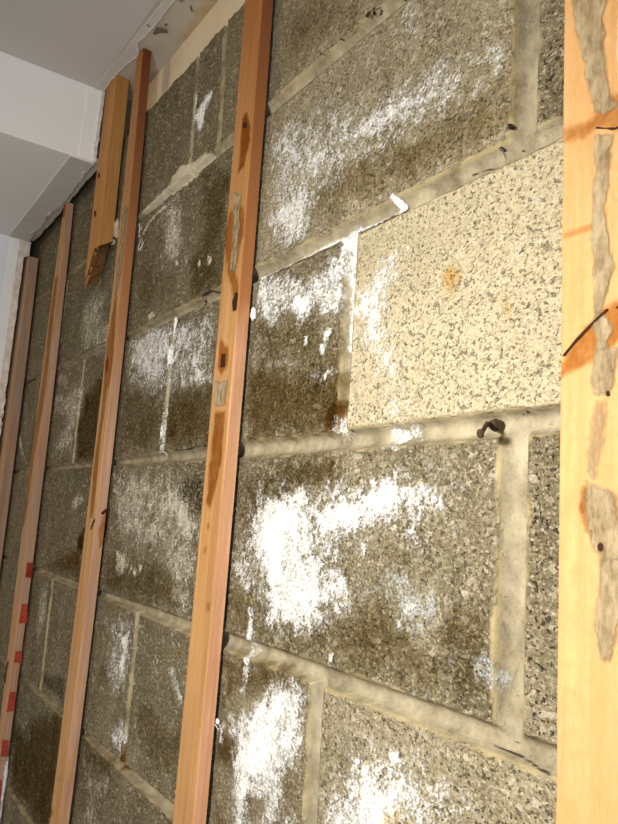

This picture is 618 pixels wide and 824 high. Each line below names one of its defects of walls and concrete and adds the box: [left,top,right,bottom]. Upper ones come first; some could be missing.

damp [269,70,459,244]
damp [143,192,188,265]
damp [132,317,211,388]
crack [563,306,618,356]
damp [237,465,442,636]
damp [241,608,258,692]
damp [220,677,303,824]